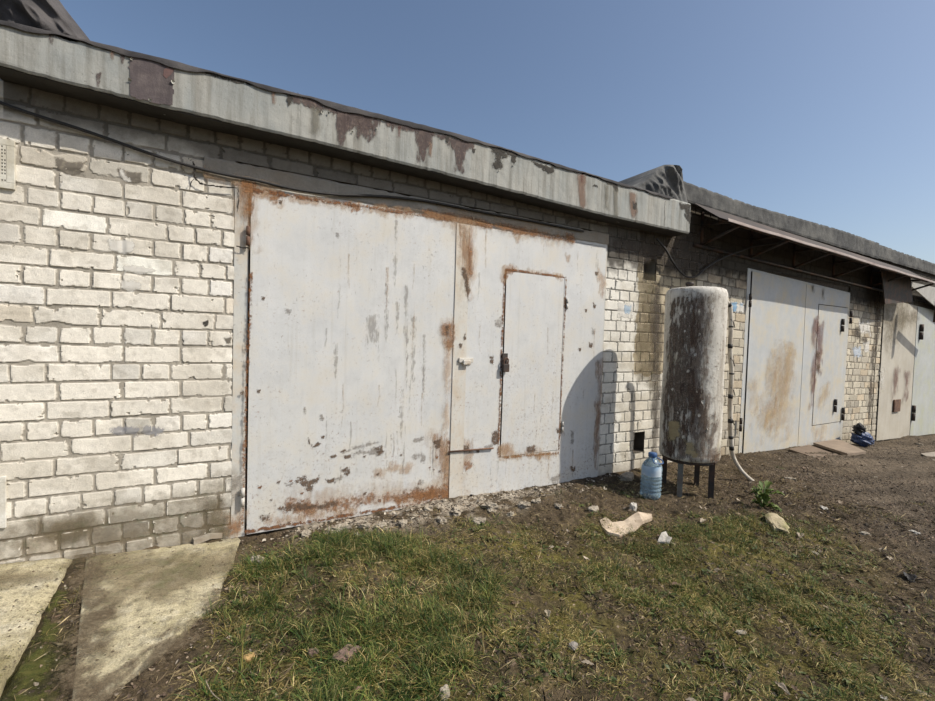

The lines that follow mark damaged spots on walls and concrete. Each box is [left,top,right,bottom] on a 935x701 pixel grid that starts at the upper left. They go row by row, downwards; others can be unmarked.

corrosion [461,247,473,300]
corrosion [441,324,466,349]
corrosion [497,267,567,458]
corrosion [811,319,823,393]
corrosion [229,272,449,534]
spalling [277,449,352,507]